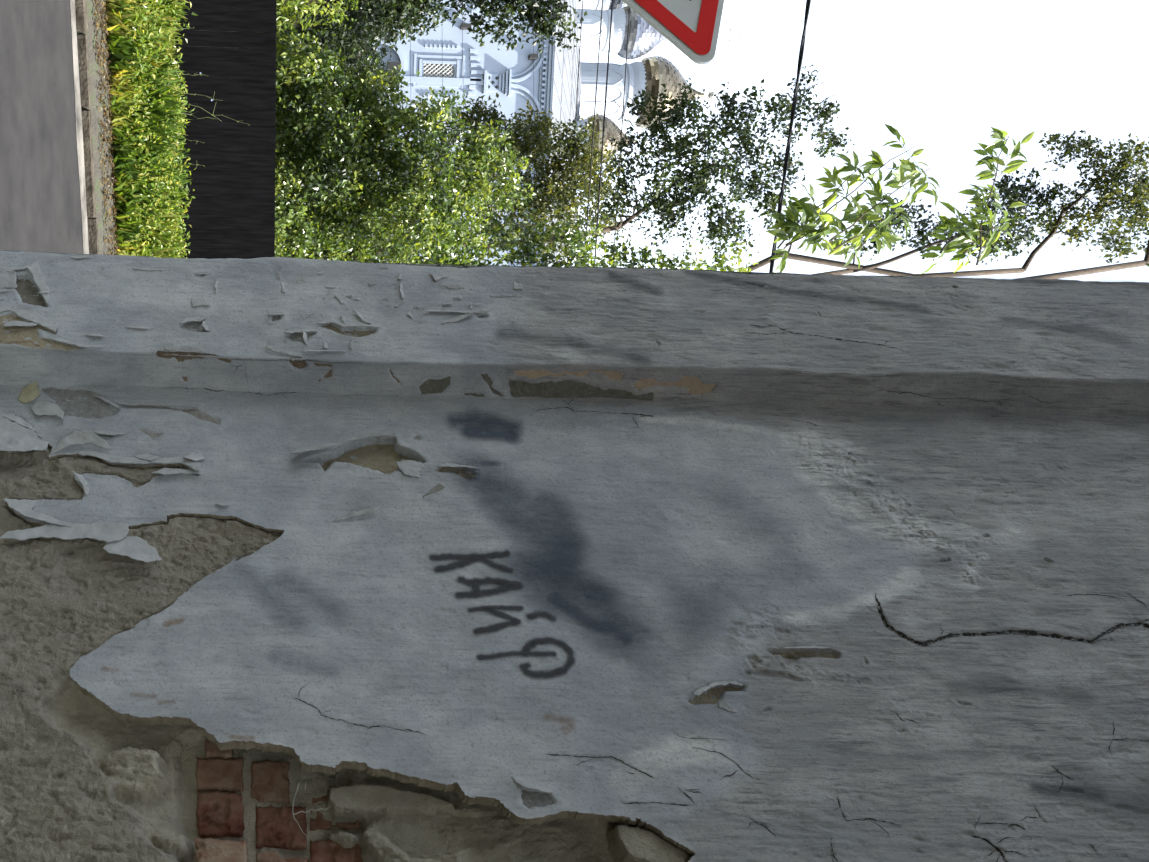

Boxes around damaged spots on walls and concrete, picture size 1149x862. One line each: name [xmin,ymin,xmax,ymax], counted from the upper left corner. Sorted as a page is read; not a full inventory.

peeling [0,261,106,351]
peeling [156,345,231,363]
peeling [180,273,219,332]
peeling [265,272,379,381]
peeling [379,266,523,325]
flaking render [0,382,695,862]
crack [867,592,1149,646]
flaking render [752,645,837,665]
flaking render [688,680,743,713]
crack [826,796,898,841]
crack [972,766,1071,862]